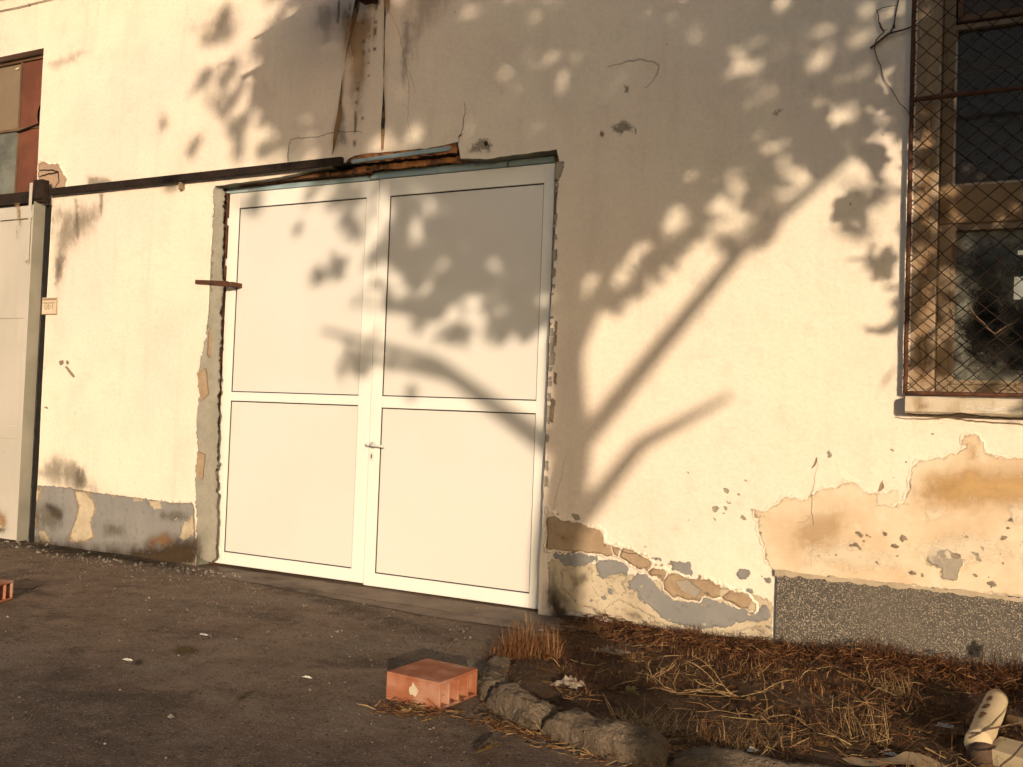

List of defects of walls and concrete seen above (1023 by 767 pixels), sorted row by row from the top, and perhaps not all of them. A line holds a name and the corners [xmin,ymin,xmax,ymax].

spalling [555,161,564,201]
peeling [25,188,225,563]
spalling [545,316,558,442]
peeling [542,431,1023,642]